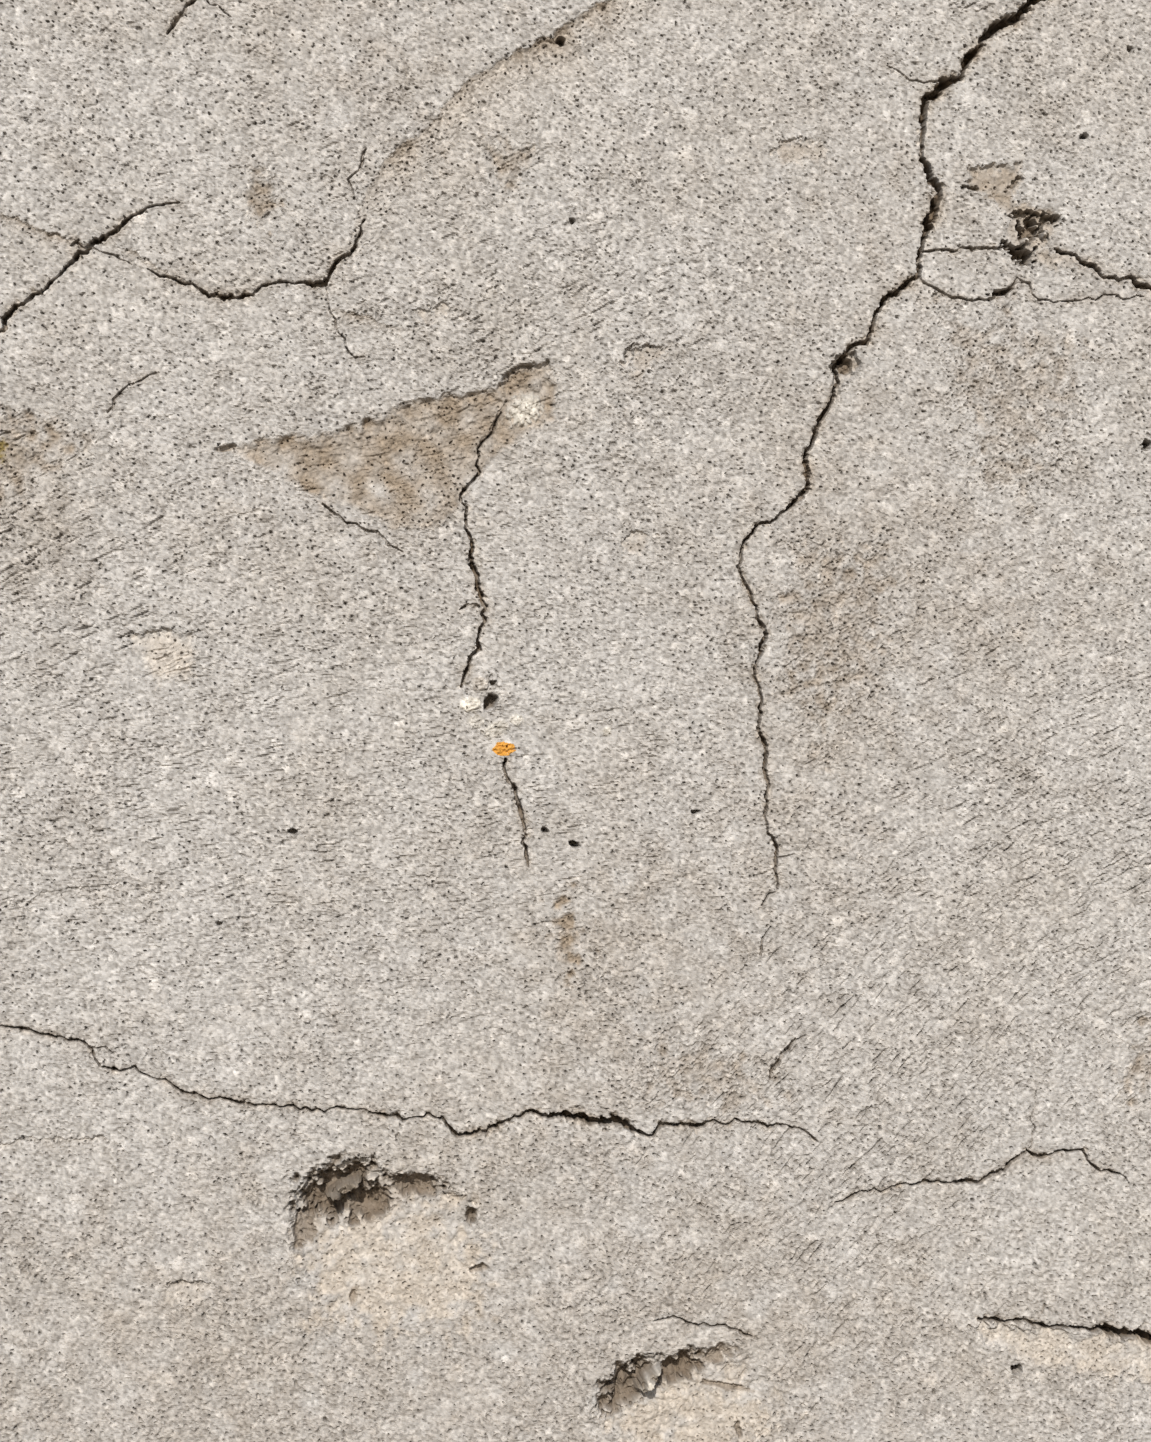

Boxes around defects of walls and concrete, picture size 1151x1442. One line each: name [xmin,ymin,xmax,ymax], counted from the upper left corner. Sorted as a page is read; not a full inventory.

crack [164,0,234,37]
crack [0,146,369,360]
crack [320,501,406,555]
peeling [216,358,560,530]
crack [457,411,504,690]
crack [735,0,1151,959]
crack [501,756,532,870]
crack [0,1023,821,1145]
crack [833,1088,1132,1206]
spalling [286,1150,492,1337]
crack [975,1301,1151,1348]
spalling [587,1342,787,1442]